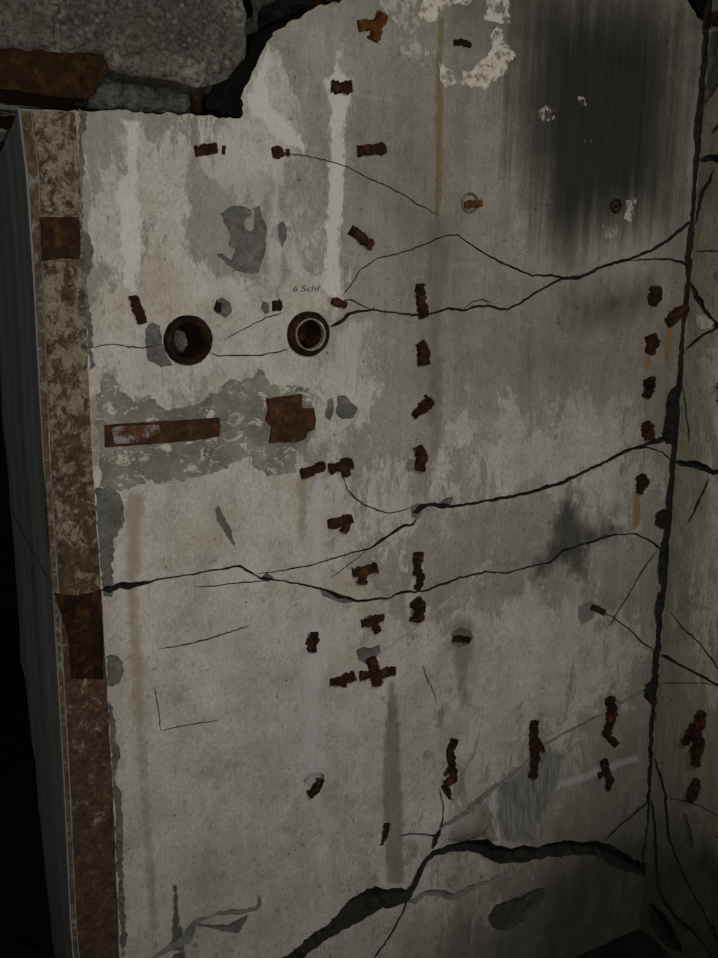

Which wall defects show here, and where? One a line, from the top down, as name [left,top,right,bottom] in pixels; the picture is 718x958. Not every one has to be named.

peeling [379,0,471,67]
peeling [439,0,516,89]
crack [292,154,440,216]
crack [344,0,718,350]
peeling [603,197,637,238]
crack [89,342,161,350]
spalling [77,109,358,597]
crack [330,299,418,327]
crack [102,312,718,958]
spalling [106,654,124,687]
spalling [108,703,128,958]
spalling [488,886,547,931]